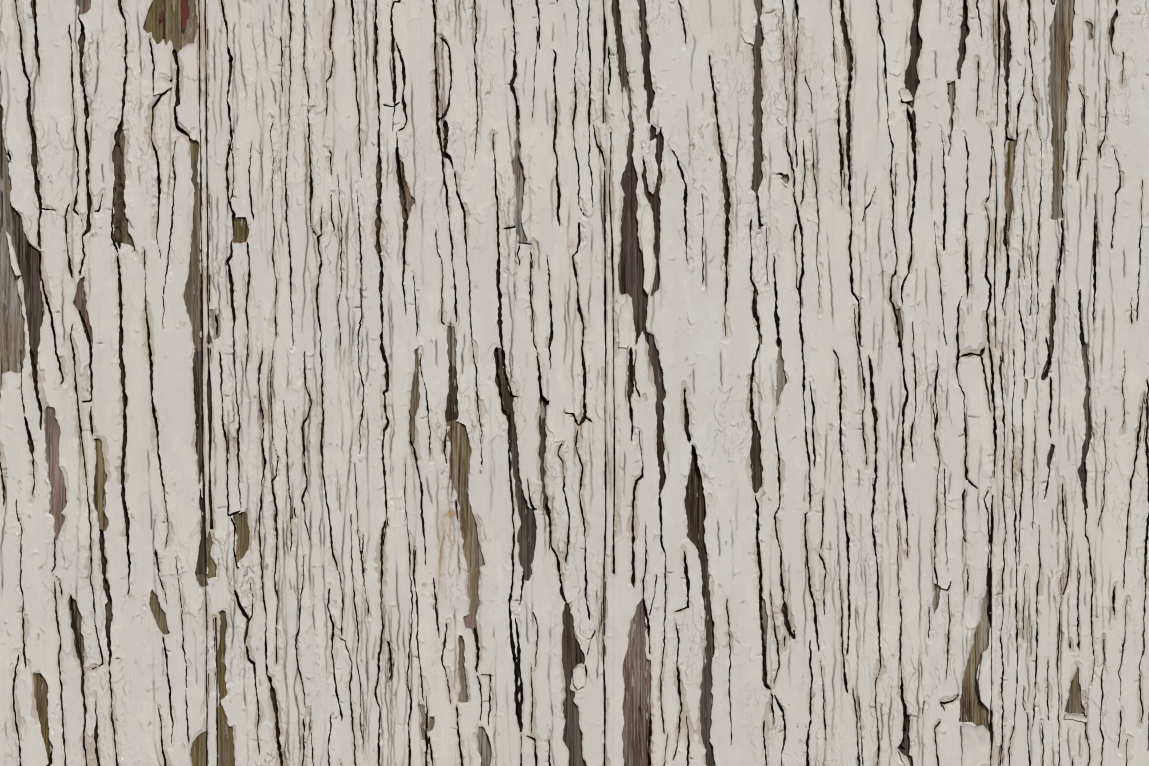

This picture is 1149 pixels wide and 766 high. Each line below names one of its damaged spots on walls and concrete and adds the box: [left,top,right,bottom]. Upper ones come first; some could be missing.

peeling [0,104,67,541]
peeling [183,139,221,587]
crack [193,0,611,766]
peeling [445,324,485,702]
peeling [495,347,551,581]
peeling [562,601,587,766]
peeling [622,598,652,766]
peeling [611,0,666,496]
crack [627,348,690,766]
peeling [684,442,715,766]
crack [672,0,1149,766]
peeling [1048,0,1093,220]